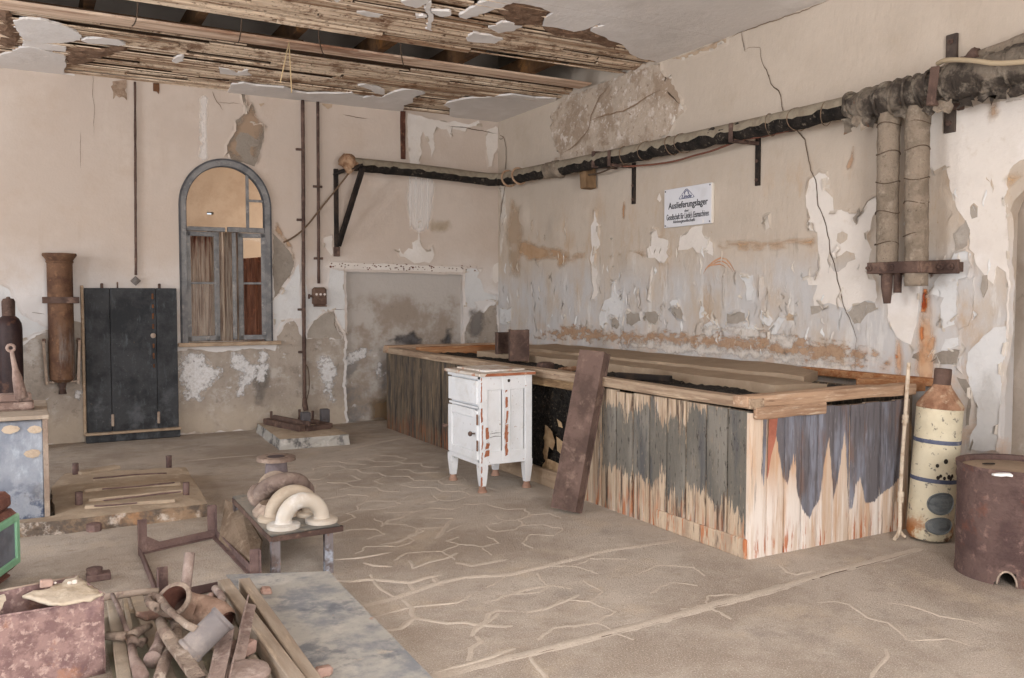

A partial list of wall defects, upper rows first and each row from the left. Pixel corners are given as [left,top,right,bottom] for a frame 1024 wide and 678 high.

crack [732,0,829,110]
flaking render [223,94,267,169]
flaking render [549,61,687,161]
flaking render [0,282,87,444]
damp [178,351,269,401]
flaking render [178,185,519,435]
damp [536,324,888,371]
peeling [526,95,1024,454]
crack [797,130,857,360]
corrosion [917,289,935,378]